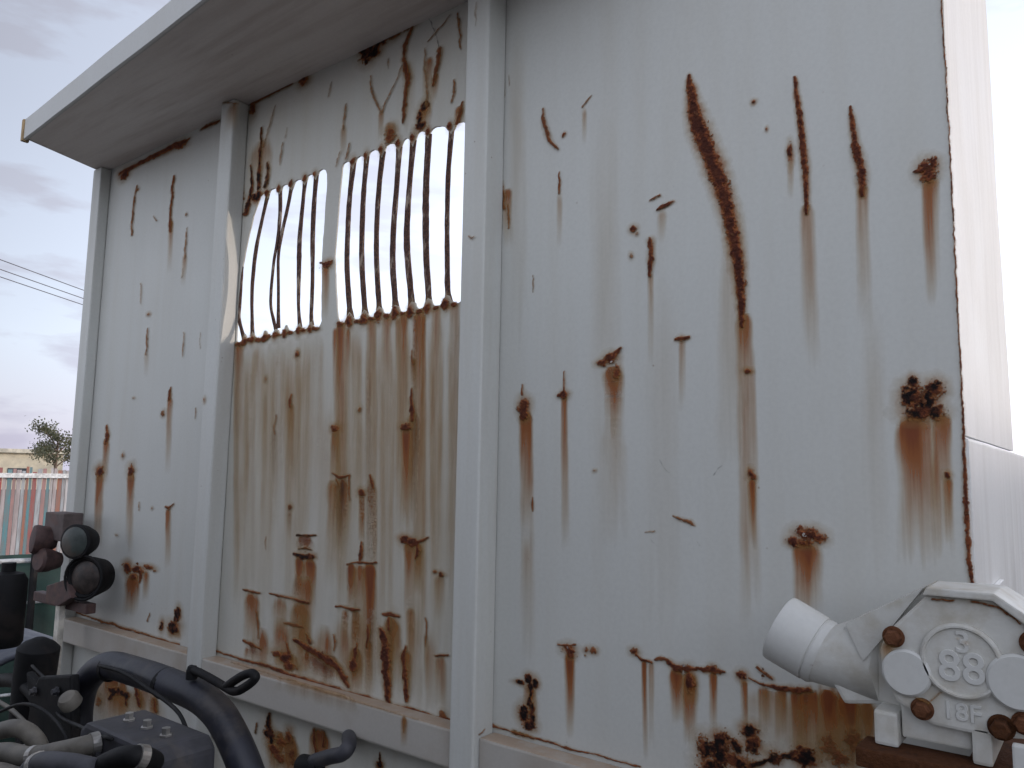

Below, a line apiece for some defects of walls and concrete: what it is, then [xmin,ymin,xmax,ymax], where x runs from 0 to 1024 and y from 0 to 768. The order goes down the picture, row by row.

rust [242,127,316,216]
rust [336,26,442,166]
rust [685,74,752,374]
rust [786,76,809,225]
rust [848,105,867,205]
rust [234,325,320,374]
rust [330,297,457,491]
rust [898,0,974,583]
rust [785,525,829,594]
rust [259,610,428,732]
rust [512,673,539,740]
rust [629,647,874,768]